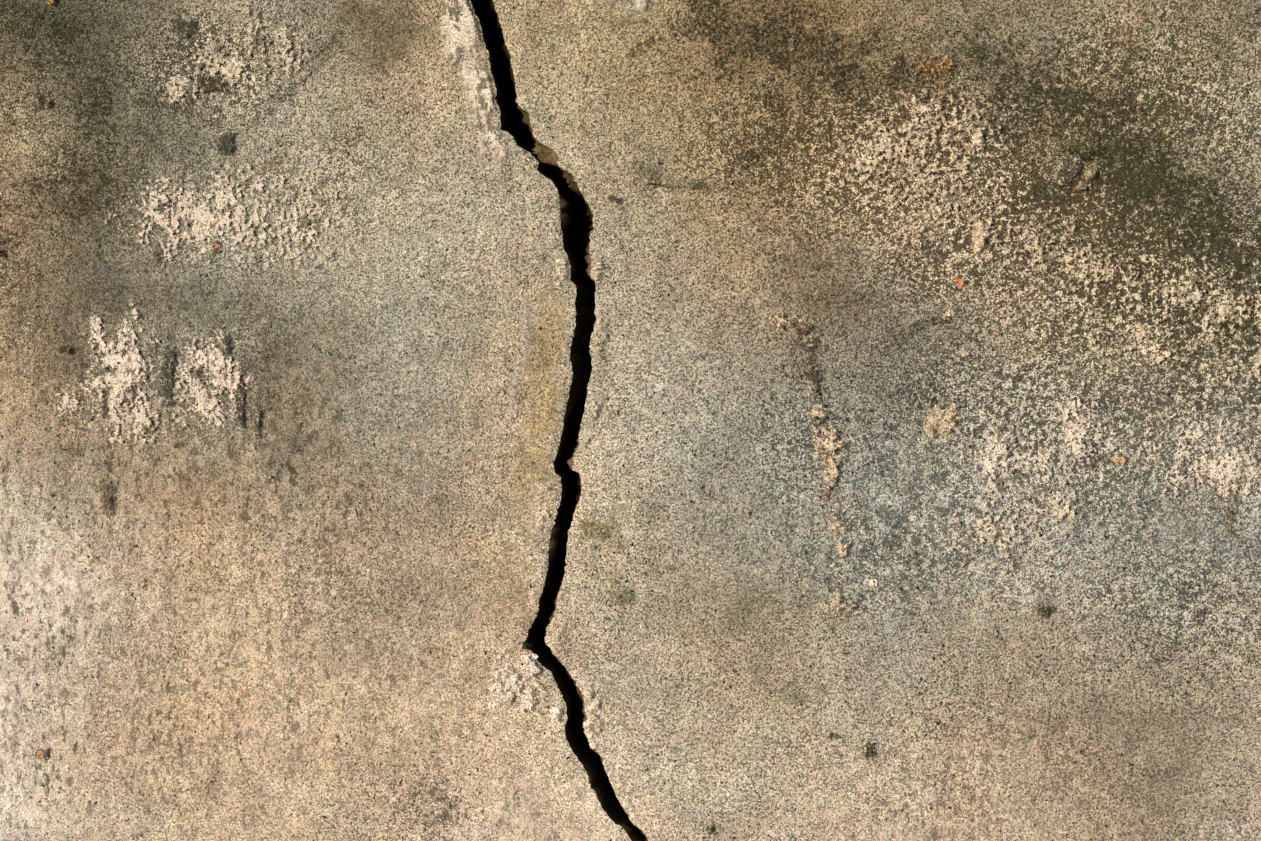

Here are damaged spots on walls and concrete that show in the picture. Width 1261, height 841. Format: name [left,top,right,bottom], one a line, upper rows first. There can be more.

crack [470,0,772,841]
damp [625,0,1261,362]